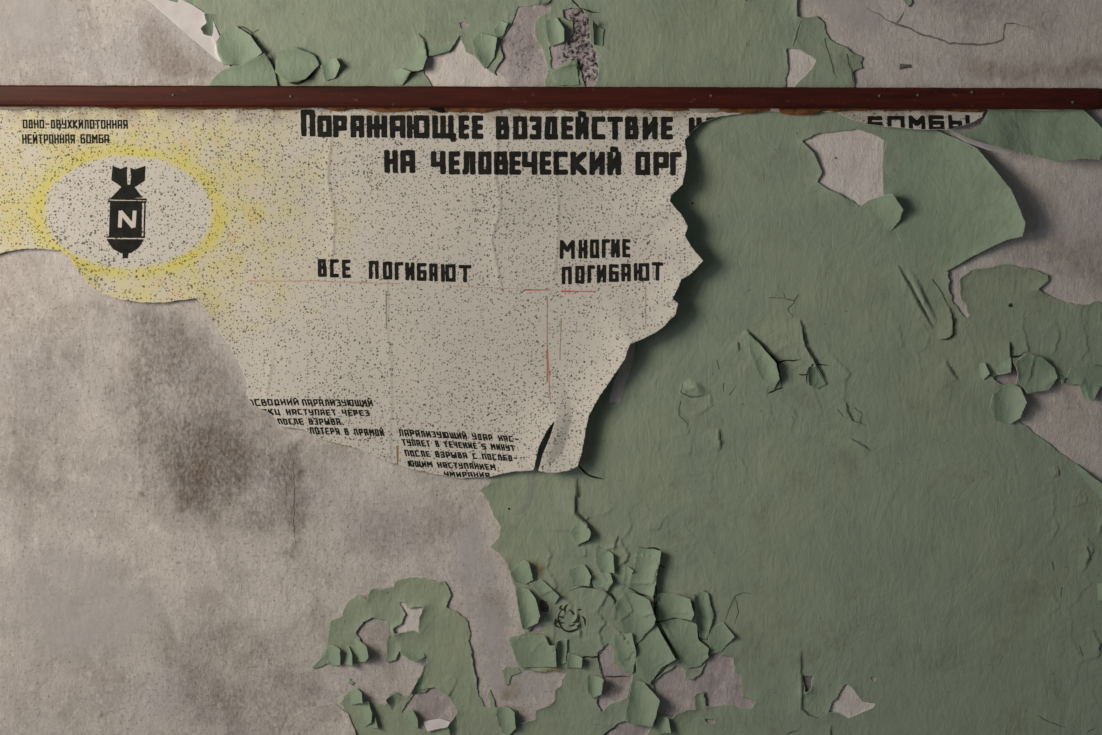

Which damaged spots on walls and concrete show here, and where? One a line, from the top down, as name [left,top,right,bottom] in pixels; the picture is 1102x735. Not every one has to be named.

peeling [0,0,340,86]
peeling [392,0,604,87]
peeling [786,48,816,87]
peeling [797,0,1102,89]
peeling [803,109,1102,318]
peeling [748,333,780,390]
peeling [979,353,1102,500]
peeling [0,249,755,735]
crack [554,465,709,680]
peeling [829,684,874,718]